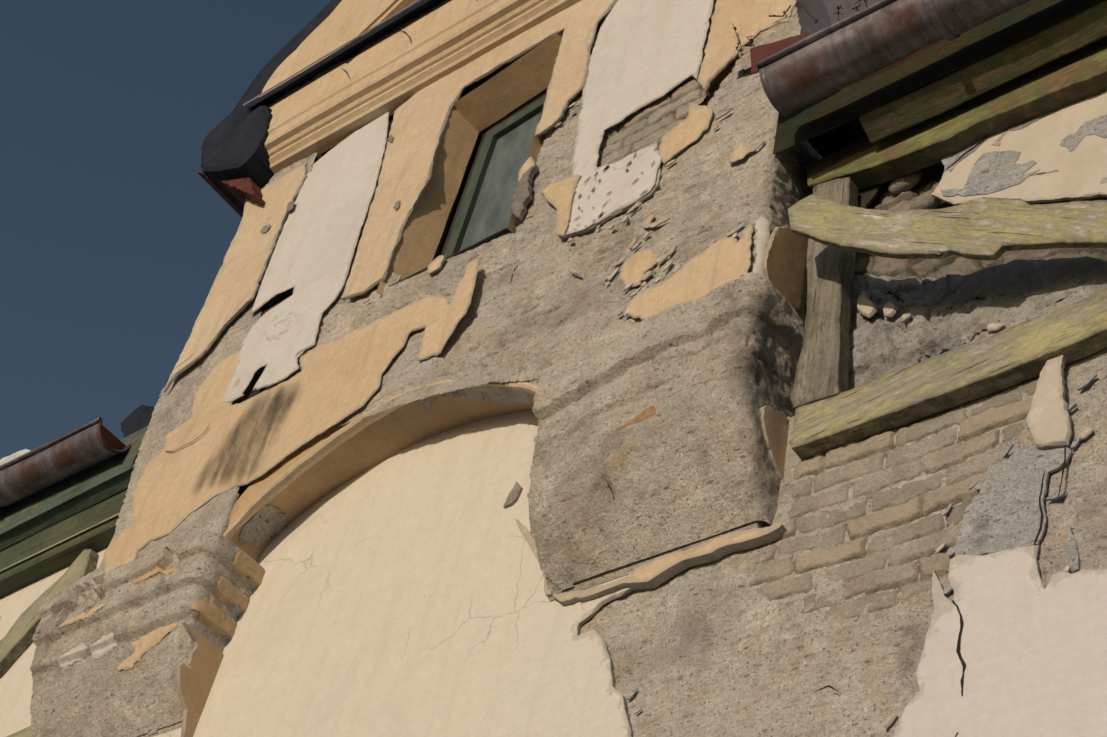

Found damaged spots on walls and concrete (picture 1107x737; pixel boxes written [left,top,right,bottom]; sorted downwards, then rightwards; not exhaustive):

damp [202,390,294,481]
flaking render [297,5,1107,737]
flaking render [30,487,289,737]
crack [952,600,966,696]